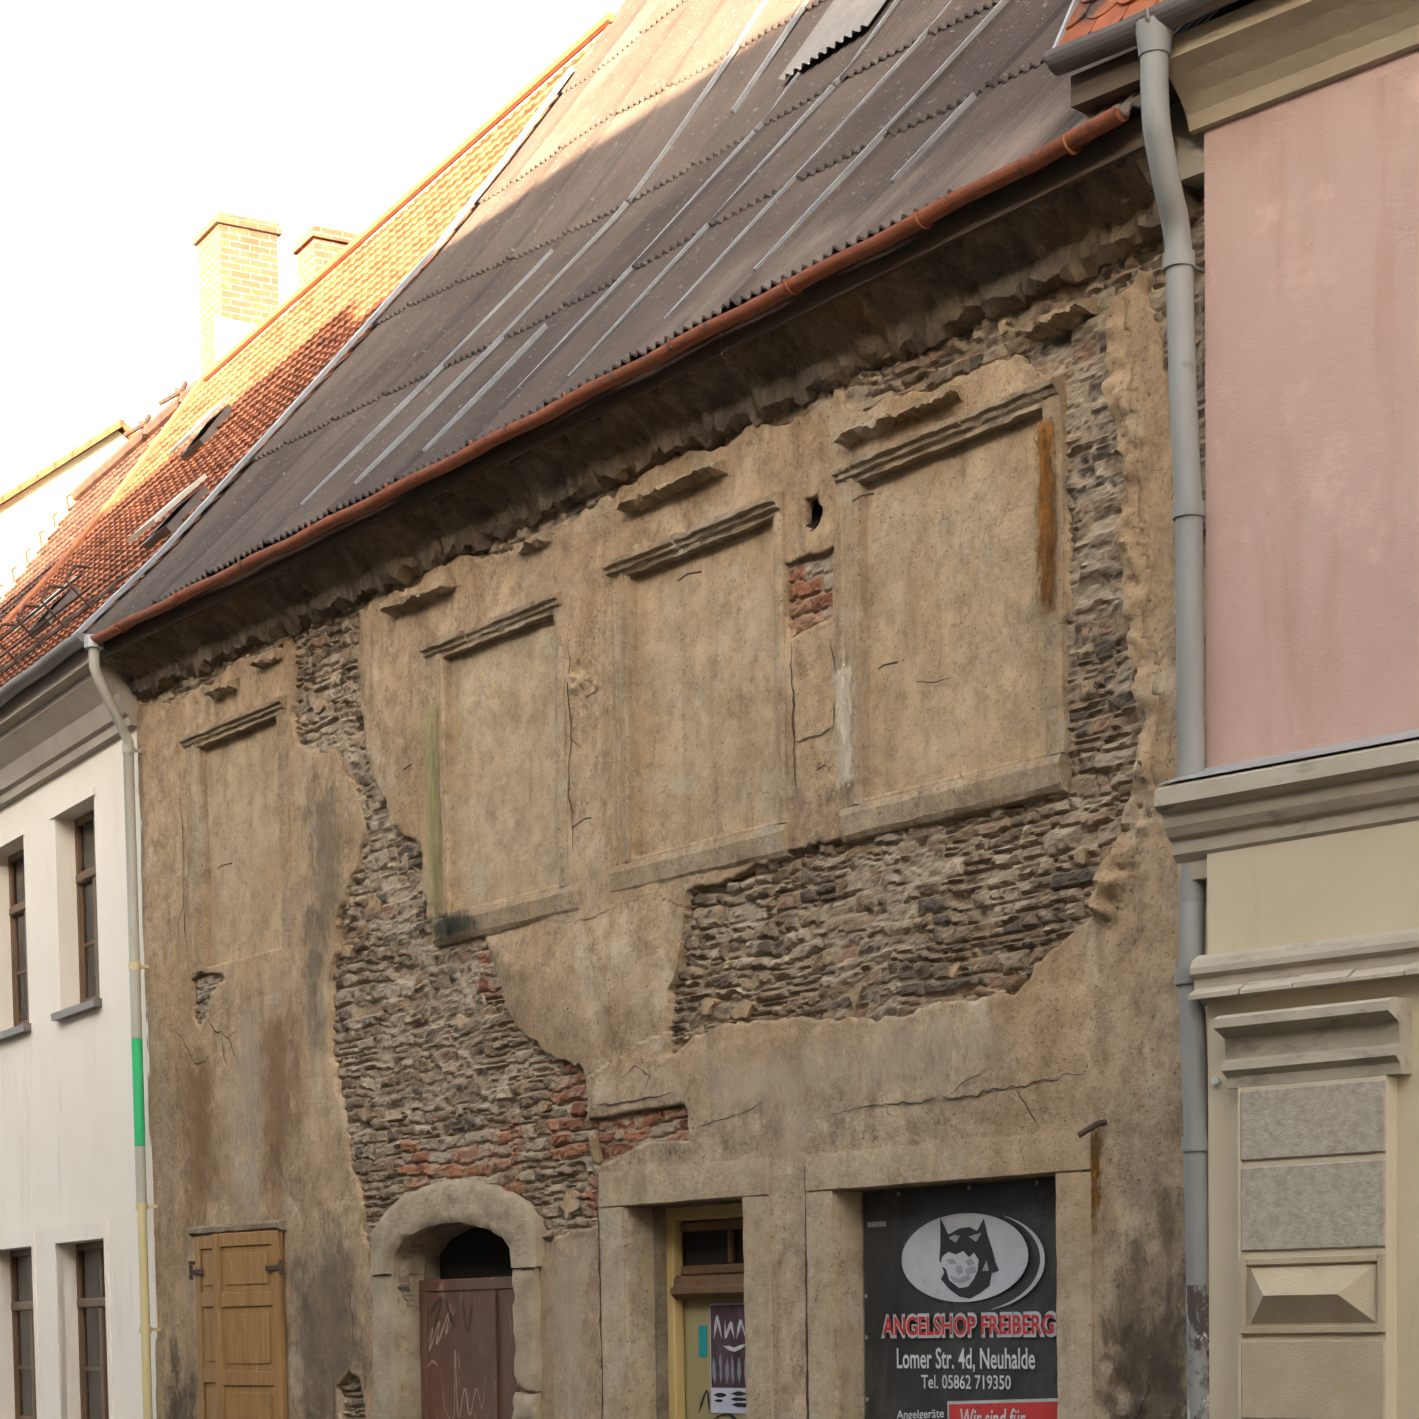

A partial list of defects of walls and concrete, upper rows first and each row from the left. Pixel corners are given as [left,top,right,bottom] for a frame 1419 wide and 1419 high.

spalling [470,477,640,559]
spalling [669,240,1169,1054]
spalling [1190,187,1206,546]
spalling [140,576,689,1307]
crack [831,1067,1082,1126]
spalling [338,1374,366,1419]